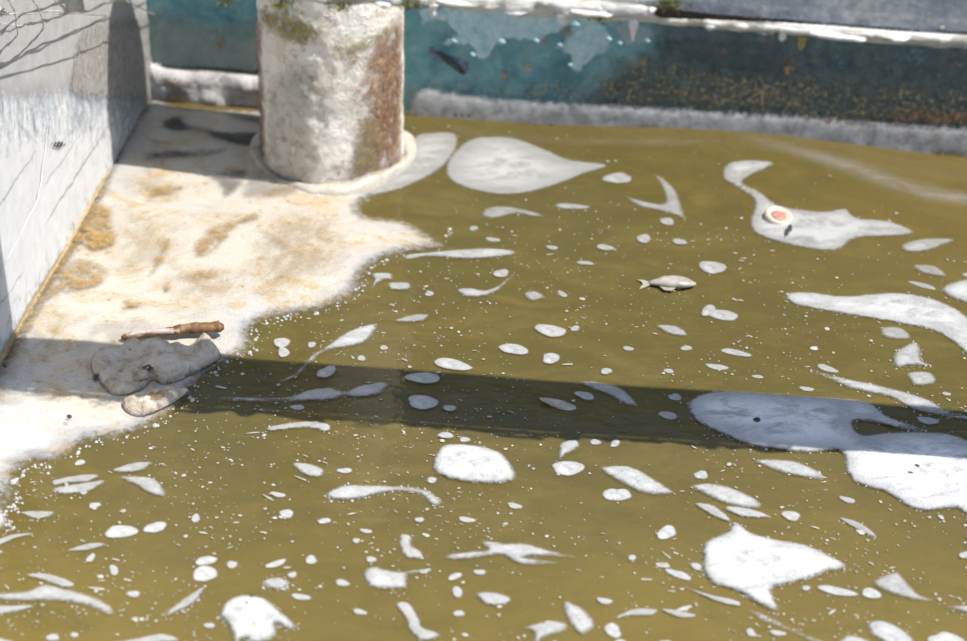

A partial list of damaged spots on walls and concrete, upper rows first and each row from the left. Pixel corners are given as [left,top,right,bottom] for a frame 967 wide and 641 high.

peeling [419,7,653,72]
leakage [272,0,967,49]
rust [350,24,403,177]